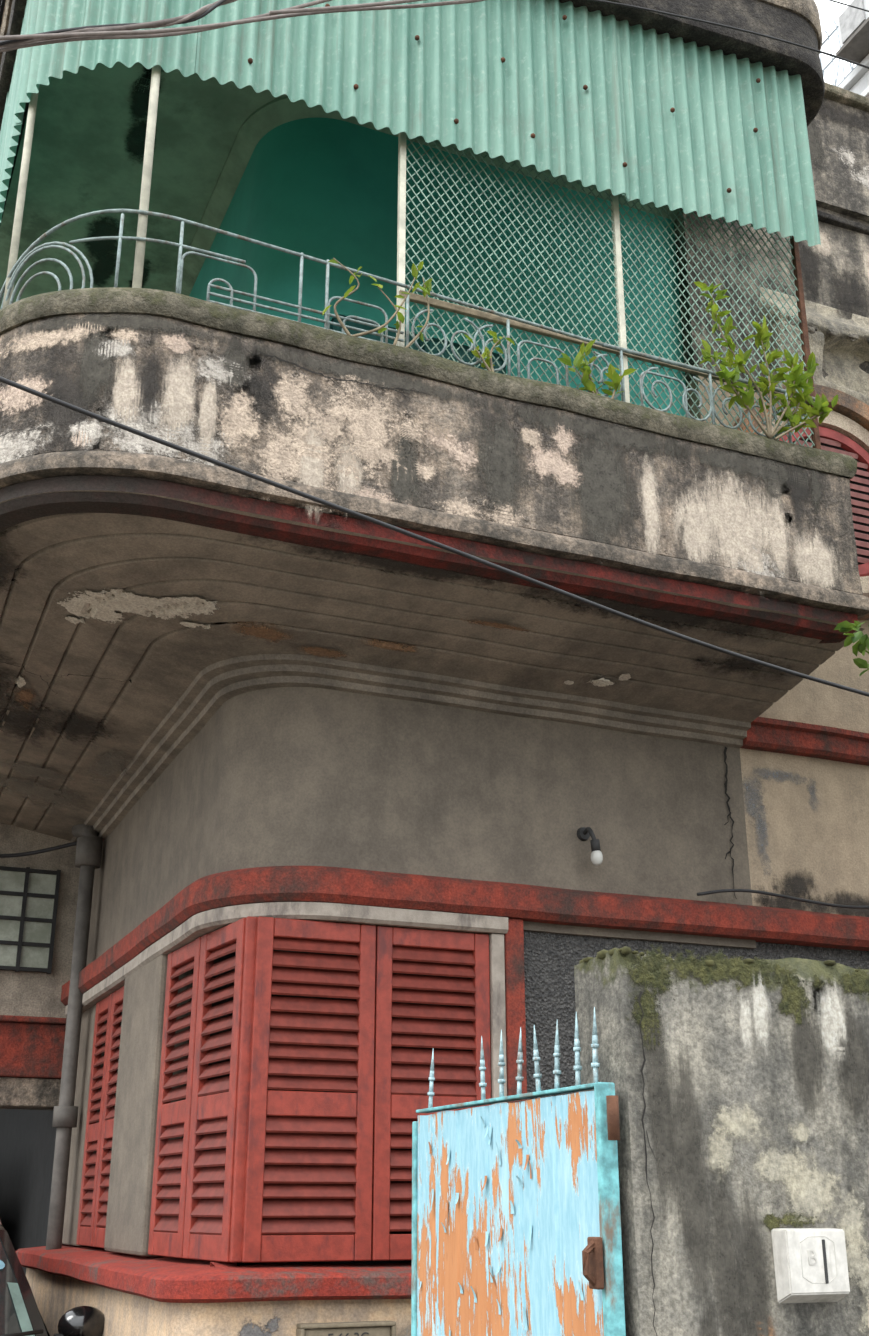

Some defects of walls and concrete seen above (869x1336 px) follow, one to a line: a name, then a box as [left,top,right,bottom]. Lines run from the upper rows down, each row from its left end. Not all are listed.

leakage [0,313,474,466]
leakage [391,429,419,507]
leakage [477,403,836,588]
peeling [57,588,220,629]
leakage [298,547,501,585]
leakage [524,587,757,637]
leakage [0,655,109,742]
leakage [696,658,783,676]
crack [724,747,737,899]
leakage [740,984,768,1045]
leakage [793,988,869,1115]
leakage [647,1023,769,1336]